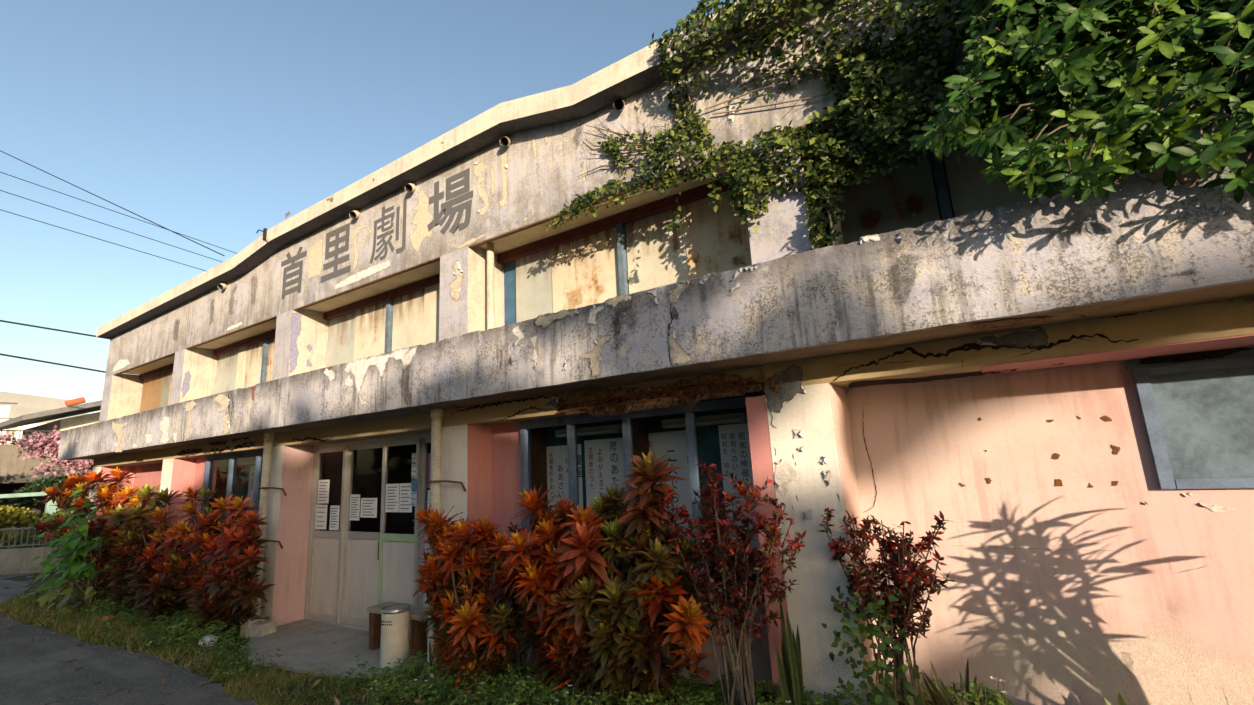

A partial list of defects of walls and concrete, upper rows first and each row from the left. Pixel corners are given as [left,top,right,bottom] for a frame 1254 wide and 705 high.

peeling [450,150,527,301]
leakage [1042,209,1110,256]
peeling [728,262,760,296]
leakage [887,254,922,310]
peeling [112,371,249,457]
peeling [290,313,435,422]
peeling [512,294,632,377]
spalling [546,365,807,417]
peeling [667,324,696,366]
peeling [792,429,804,452]
crack [833,310,1154,382]
peeling [819,456,831,486]